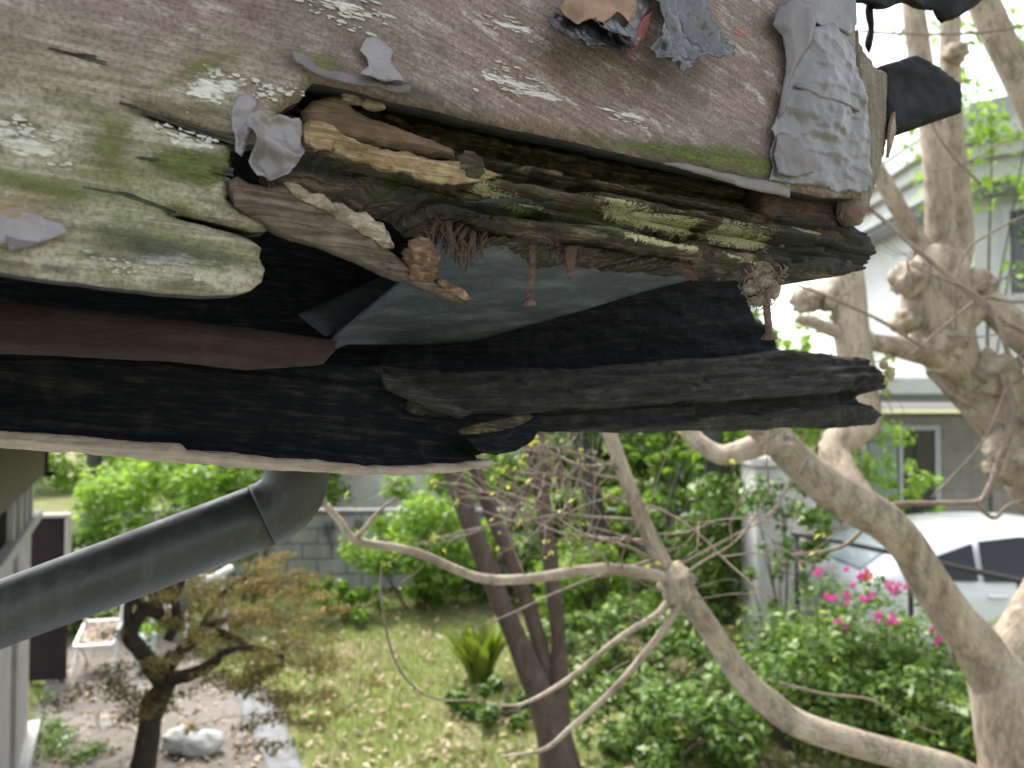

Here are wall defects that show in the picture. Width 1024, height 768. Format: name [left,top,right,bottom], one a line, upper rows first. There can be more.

peeling [546,0,736,76]
crack [119,102,235,176]
leakage [152,148,227,190]
leakage [588,133,773,179]
crack [82,185,176,215]